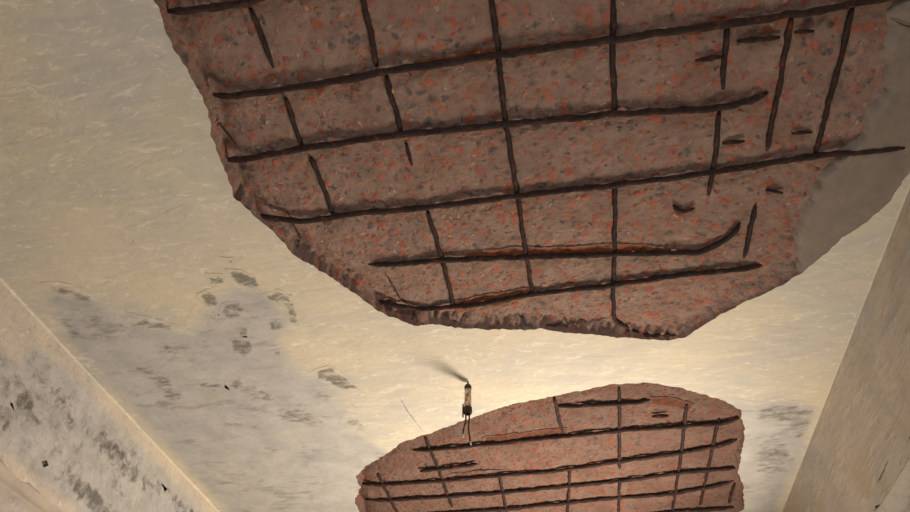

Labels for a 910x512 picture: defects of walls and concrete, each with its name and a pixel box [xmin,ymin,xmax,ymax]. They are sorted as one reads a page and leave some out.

spalling [154,0,910,341]
damp [0,257,393,512]
spalling [355,382,745,512]